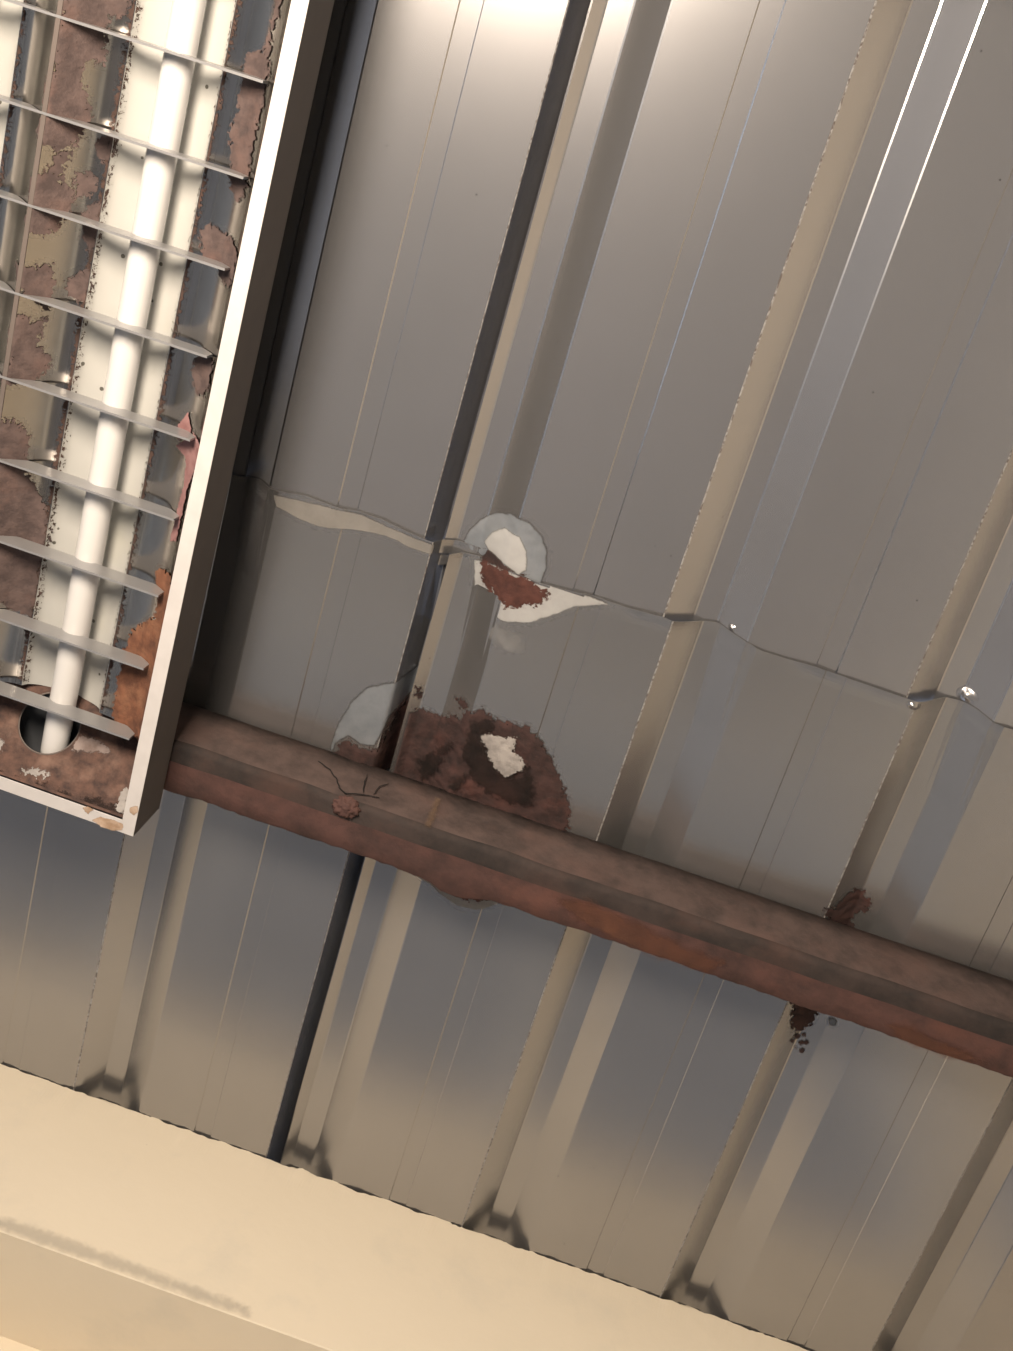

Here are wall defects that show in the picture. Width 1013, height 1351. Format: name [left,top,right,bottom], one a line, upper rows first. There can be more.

corrosion [0,0,143,682]
corrosion [100,0,282,739]
corrosion [476,548,552,610]
crack [318,761,389,798]
corrosion [331,685,571,831]
corrosion [560,900,719,972]
corrosion [822,887,872,928]
corrosion [790,1003,836,1053]
corrosion [890,1025,972,1061]